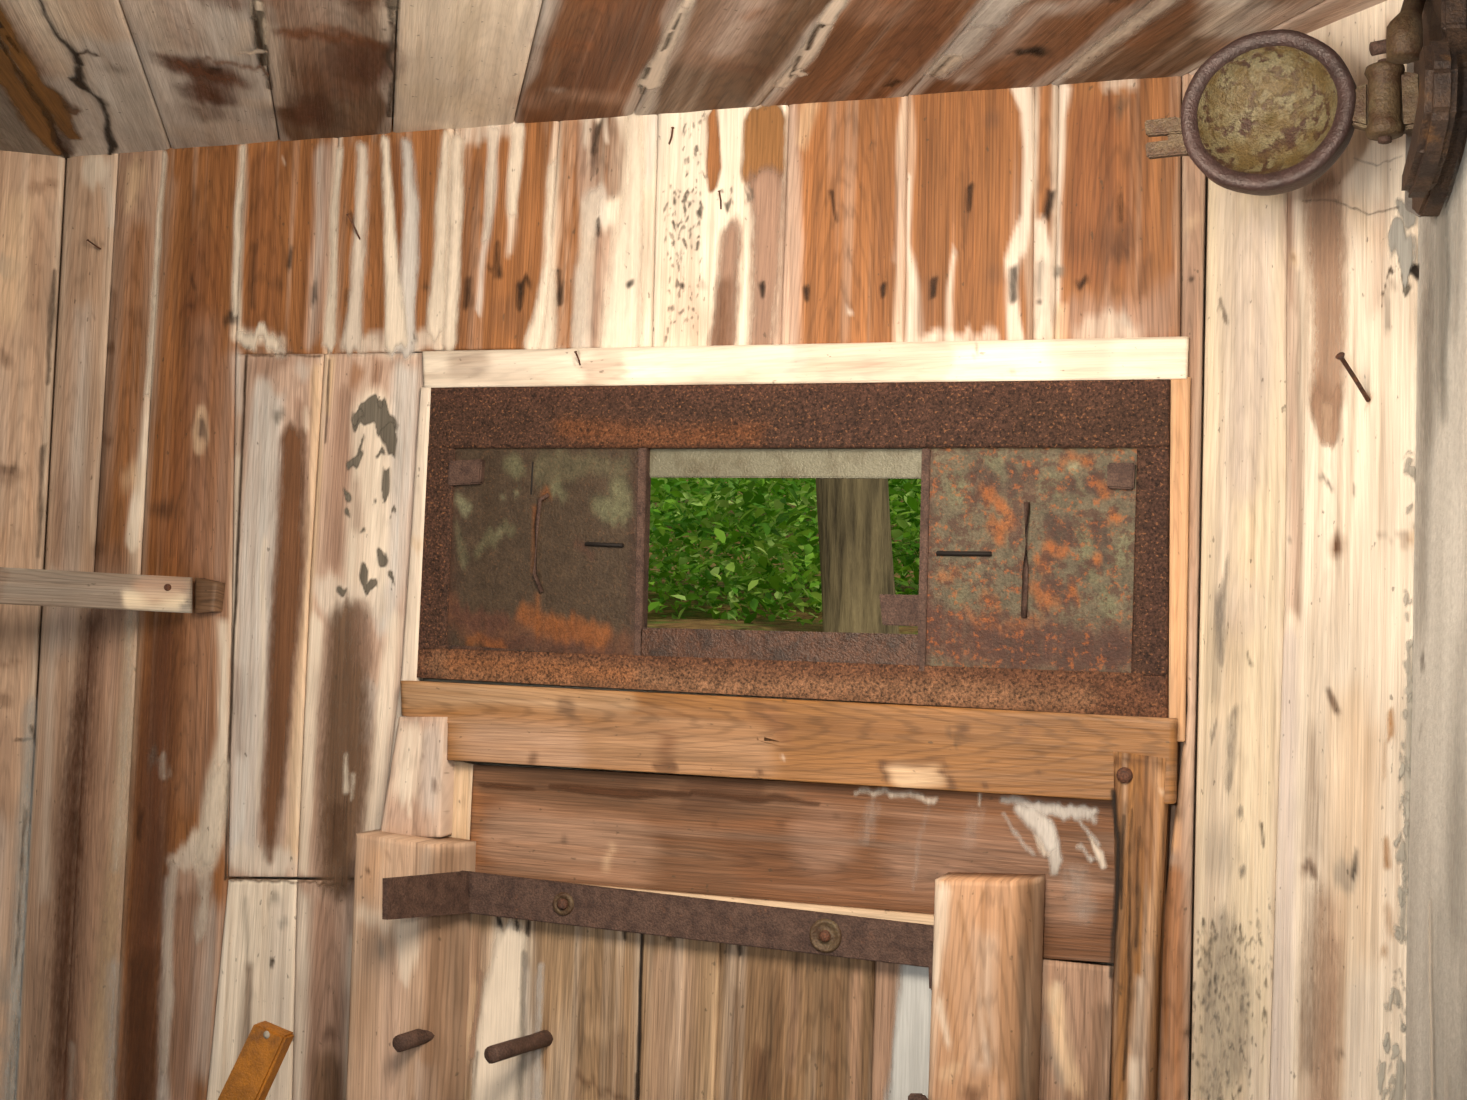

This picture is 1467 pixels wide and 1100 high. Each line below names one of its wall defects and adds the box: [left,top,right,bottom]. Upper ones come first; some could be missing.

crack [39,0,118,155]
peeling [347,394,397,512]
peeling [1404,451,1415,480]
peeling [1394,637,1414,942]
leakage [1193,917,1253,1010]
peeling [1378,981,1406,1100]